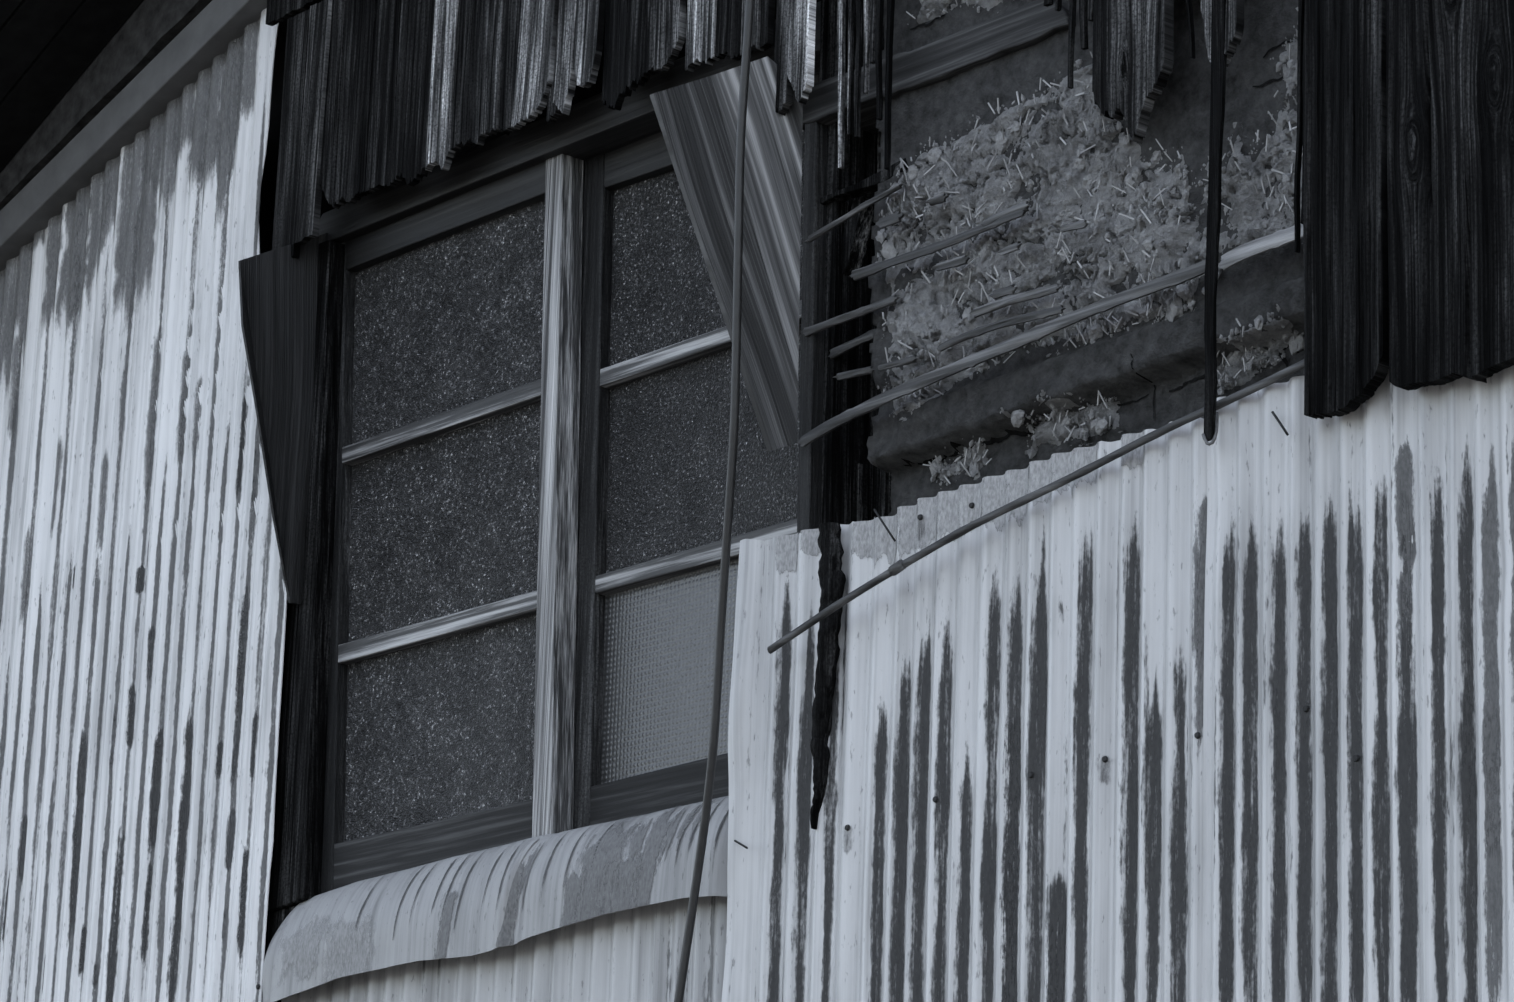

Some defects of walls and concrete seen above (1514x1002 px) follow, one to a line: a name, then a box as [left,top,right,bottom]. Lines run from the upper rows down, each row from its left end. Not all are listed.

flaking render [906,0,1014,25]
flaking render [875,7,1304,422]
peeling [775,528,820,574]
peeling [851,390,1144,569]
water stain [1191,498,1207,756]
water stain [1395,442,1416,660]
water stain [1482,710,1500,855]